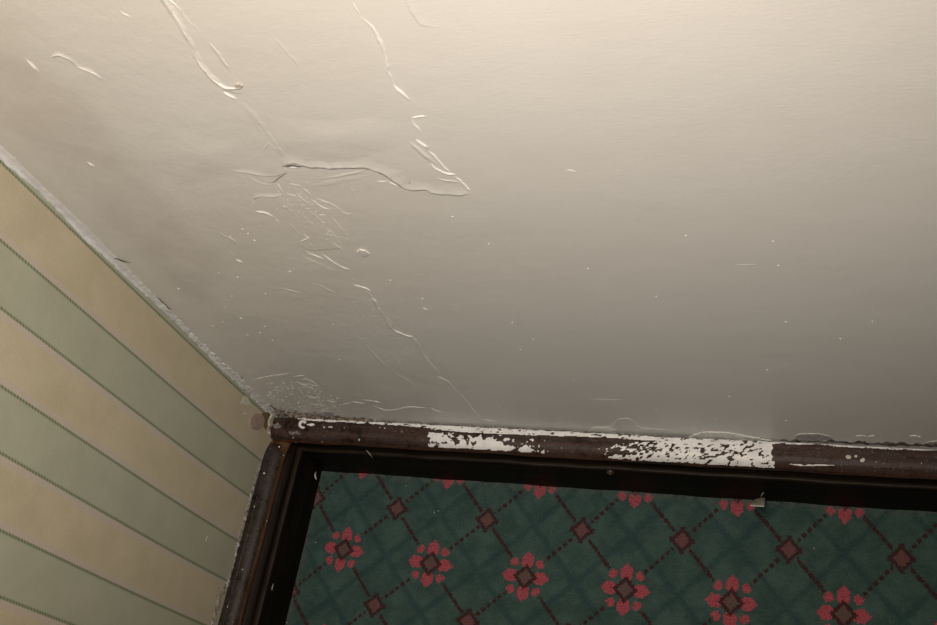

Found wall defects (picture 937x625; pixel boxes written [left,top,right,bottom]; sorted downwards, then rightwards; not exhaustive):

peeling [232,139,472,273]